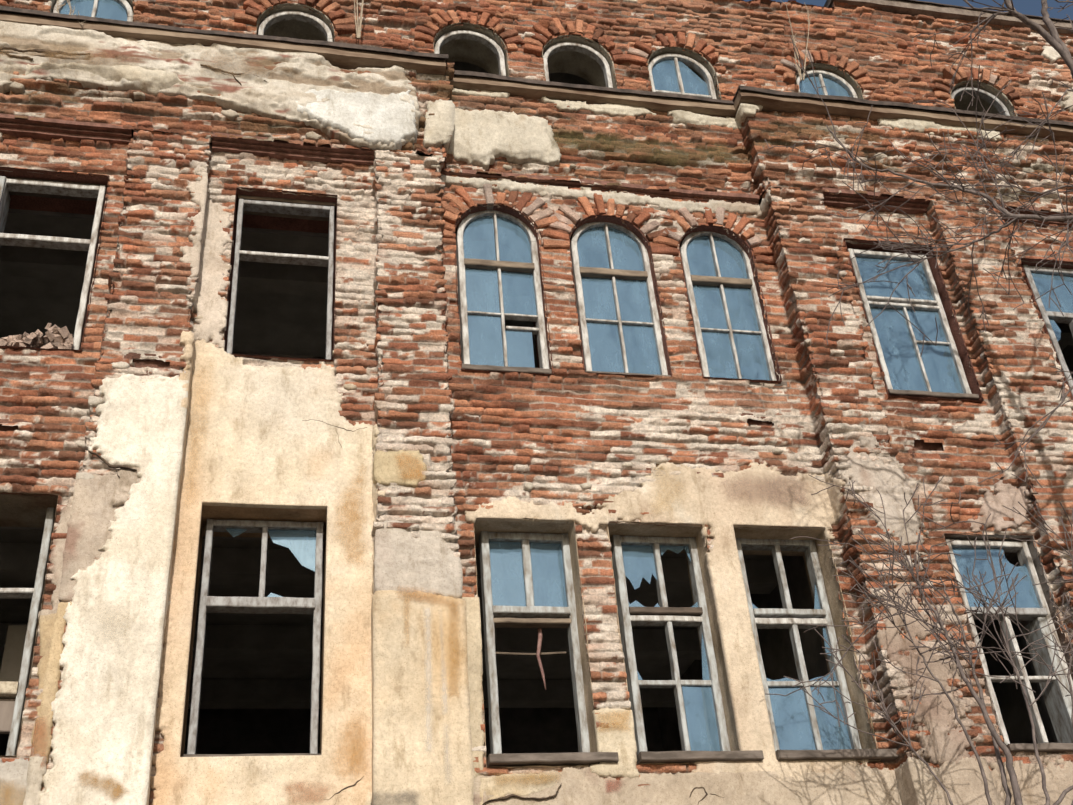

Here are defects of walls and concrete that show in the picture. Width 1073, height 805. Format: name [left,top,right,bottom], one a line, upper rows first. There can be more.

crack [0,47,89,61]
flaking render [0,20,771,219]
flaking render [0,172,1073,805]
crack [482,783,562,805]